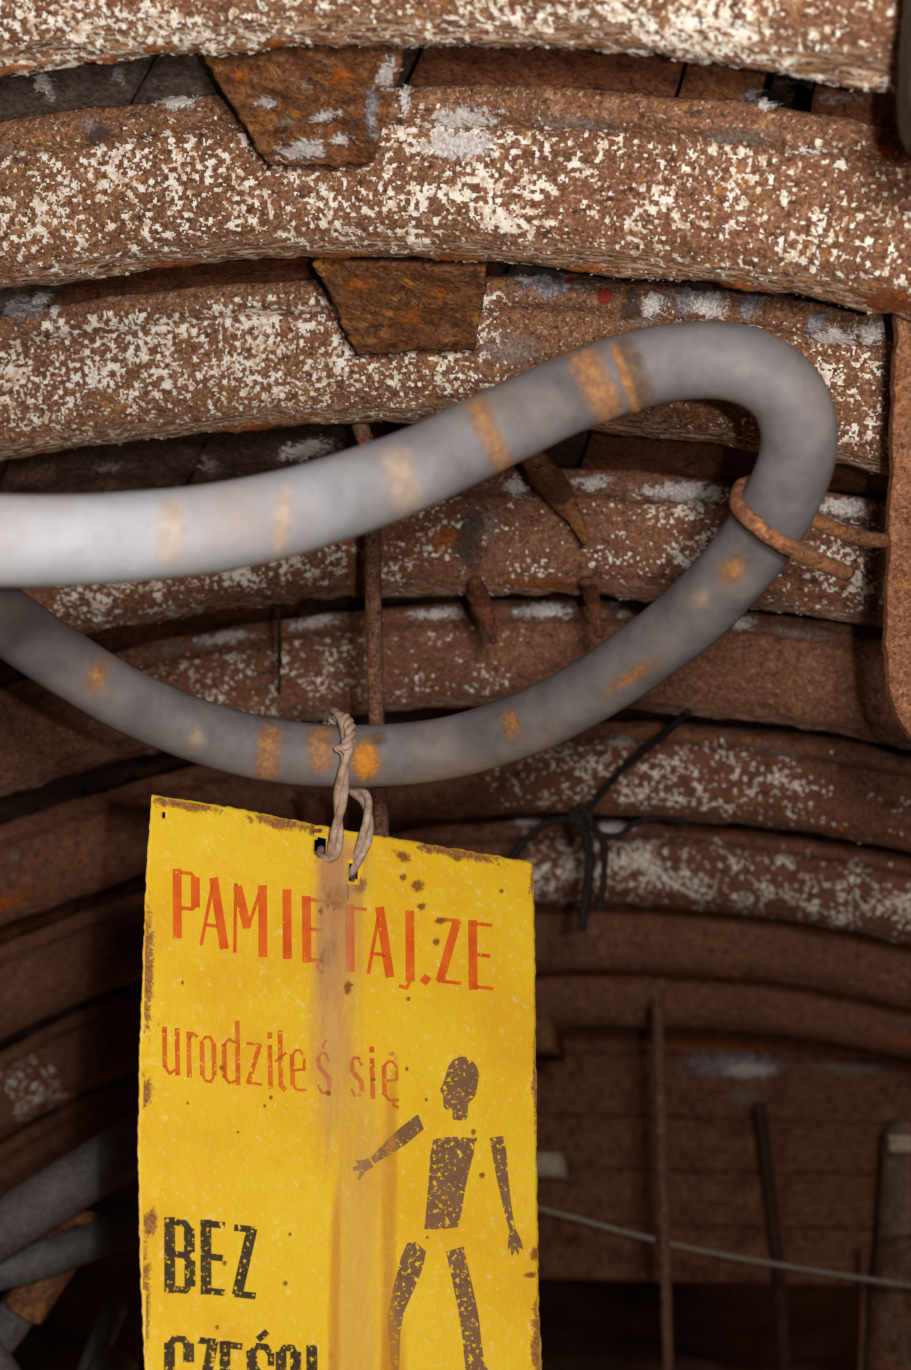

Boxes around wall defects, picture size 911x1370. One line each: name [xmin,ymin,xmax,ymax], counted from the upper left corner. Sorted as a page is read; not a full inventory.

corrosion [87,44,175,64]
corrosion [0,64,34,75]
leakage [151,95,203,113]
corrosion [562,263,613,274]
corrosion [716,280,774,294]
efflorescence [0,289,61,324]
corrosion [854,286,911,315]
efflorescence [272,432,343,465]
efflorescence [194,447,225,476]
leakage [505,819,542,827]
leakage [599,819,674,838]